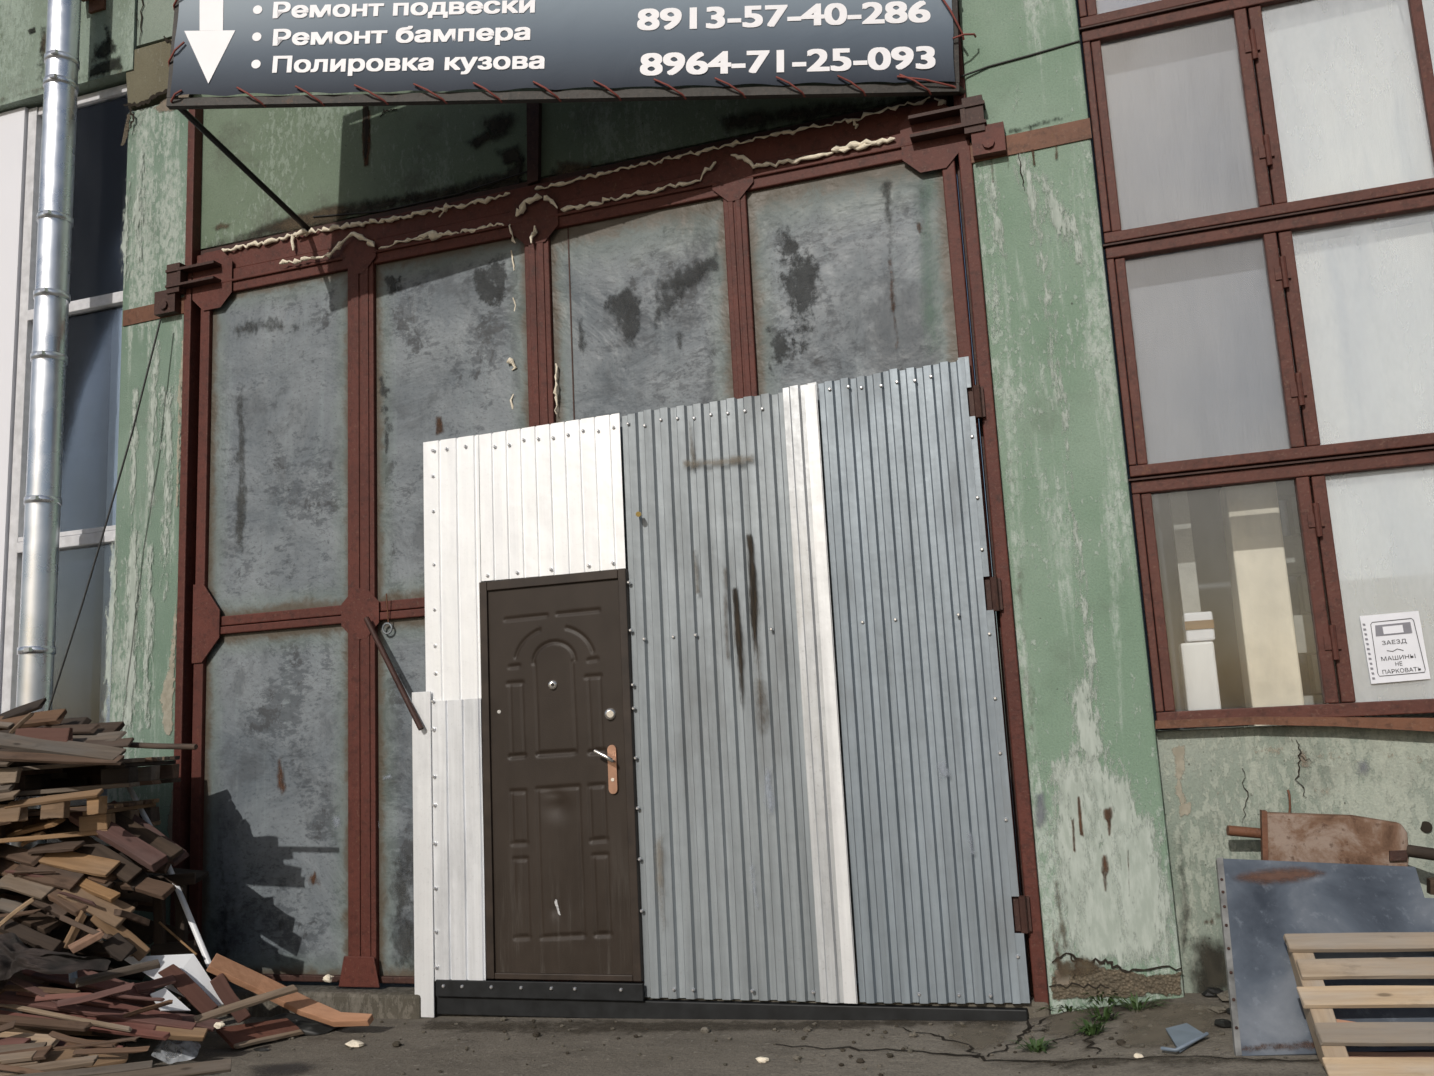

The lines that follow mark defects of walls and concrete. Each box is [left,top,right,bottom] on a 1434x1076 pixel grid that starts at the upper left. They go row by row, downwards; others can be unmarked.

peeling [121,94,189,146]
peeling [121,150,144,288]
peeling [987,180,1004,255]
peeling [1013,153,1085,457]
peeling [103,340,183,735]
rust [1072,797,1083,851]
rust [1104,808,1112,835]
peeling [1040,474,1216,1046]